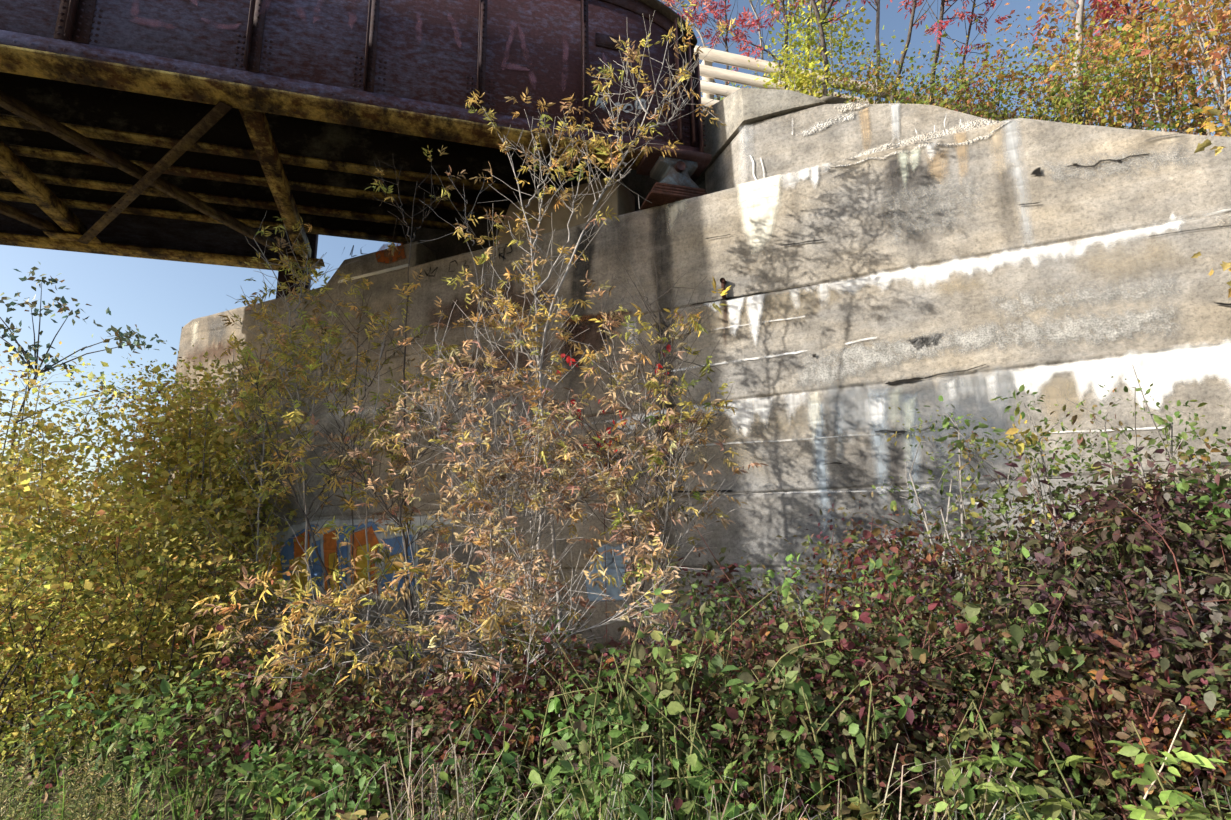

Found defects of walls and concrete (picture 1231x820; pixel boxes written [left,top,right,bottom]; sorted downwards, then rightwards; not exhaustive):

leakage [738,155,818,247]
leakage [991,119,1023,189]
crack [1067,154,1149,167]
leakage [782,209,1231,302]
leakage [611,204,685,456]
leakage [1014,341,1231,415]
leakage [869,389,934,517]